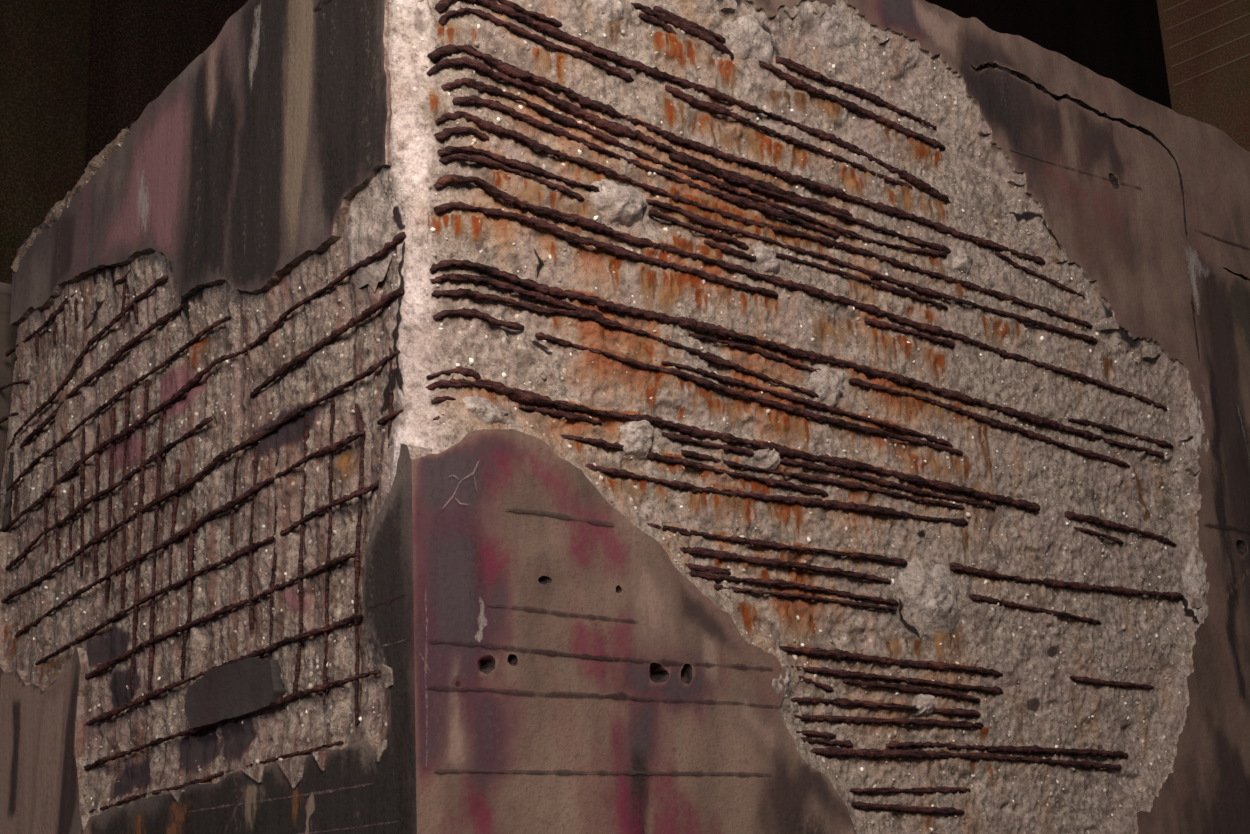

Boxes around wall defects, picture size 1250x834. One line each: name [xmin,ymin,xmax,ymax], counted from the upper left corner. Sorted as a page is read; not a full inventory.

spalling [11,125,131,272]
leakage [106,0,385,285]
rust [654,31,700,67]
rust [641,184,823,315]
rust [663,96,810,168]
crack [1010,212,1061,250]
crack [970,62,1188,242]
crack [1222,267,1250,281]
spalling [0,210,352,529]
leakage [1186,250,1250,699]
spalling [1,404,381,770]
leakage [624,595,726,834]